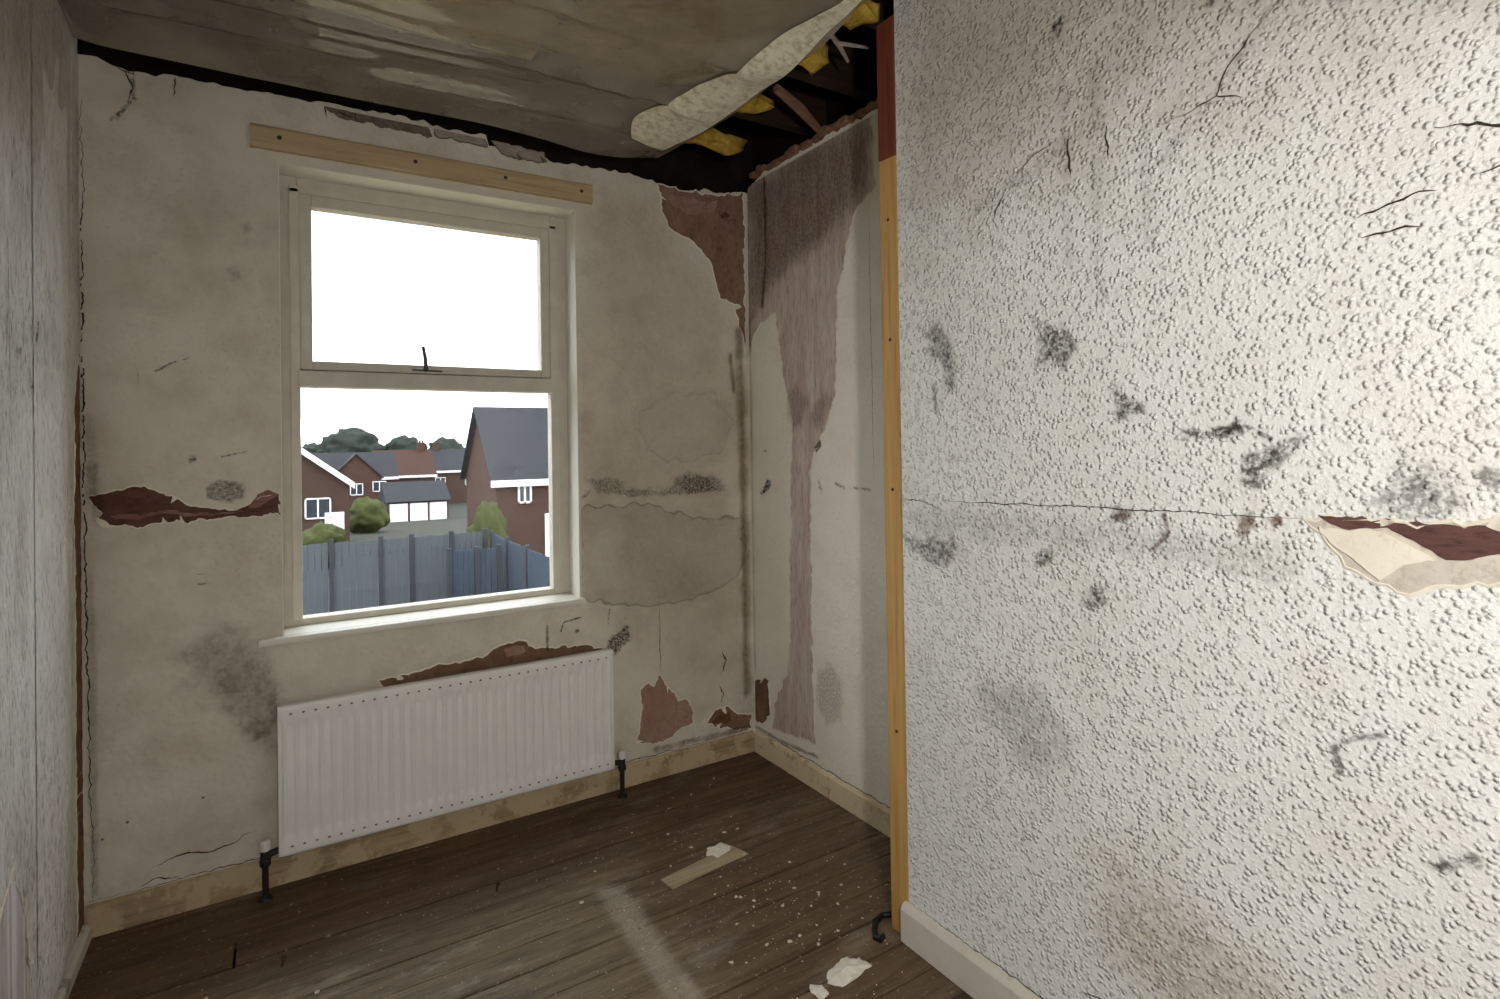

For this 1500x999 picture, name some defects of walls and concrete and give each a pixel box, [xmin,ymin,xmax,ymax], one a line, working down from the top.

crack [1434,120,1500,128]
crack [1358,190,1436,238]
peeling [635,115,877,745]
peeling [1303,513,1500,598]
peeling [73,354,281,936]
peeling [377,639,607,687]